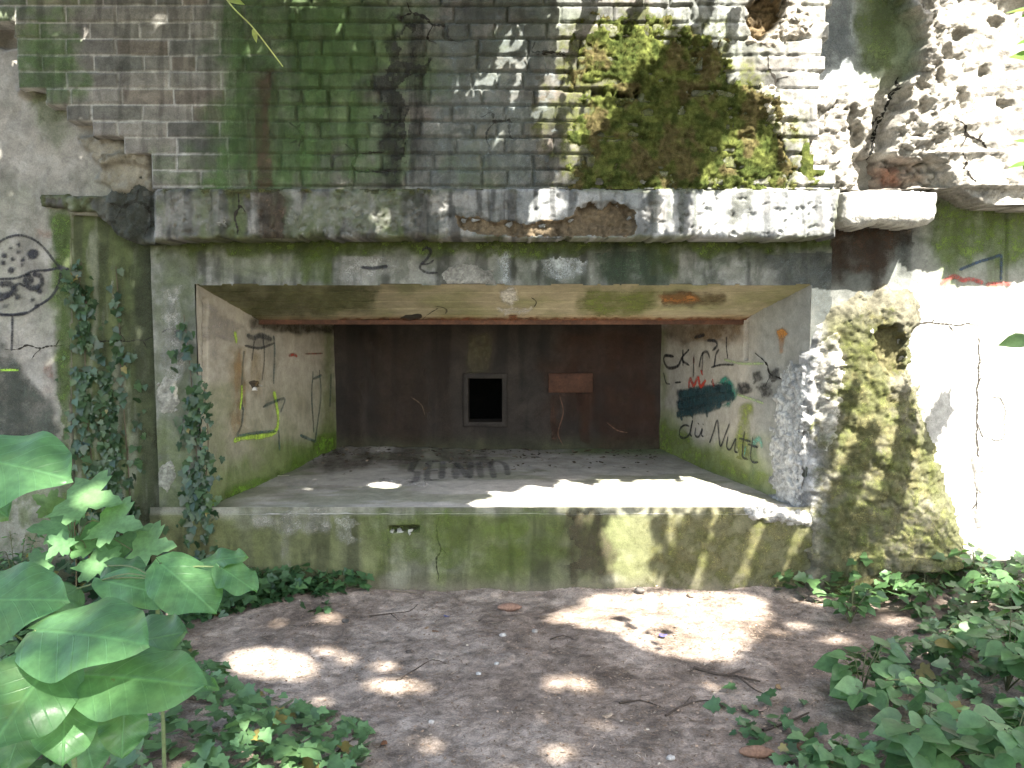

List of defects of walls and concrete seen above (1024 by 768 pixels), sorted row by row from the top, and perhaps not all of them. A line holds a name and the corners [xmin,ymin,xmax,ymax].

crack [863,77,901,161]
spalling [744,0,1024,213]
spalling [455,202,637,238]
rust [552,291,748,320]
crack [6,326,185,358]
crack [919,315,1006,457]
spalling [743,332,847,527]
spalling [389,524,420,535]
crack [435,517,447,579]